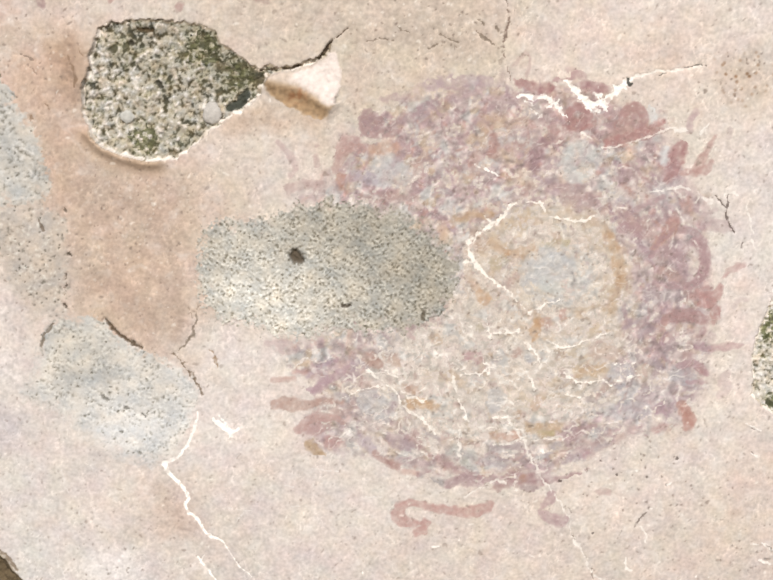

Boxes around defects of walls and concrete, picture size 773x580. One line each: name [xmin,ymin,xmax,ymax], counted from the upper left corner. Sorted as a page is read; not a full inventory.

spalling [81,18,343,162]
water stain [217,94,332,142]
crack [502,0,710,152]
spalling [289,247,305,266]
crack [650,185,758,252]
spalling [749,298,773,415]
crack [161,304,253,580]
spalling [0,549,23,580]